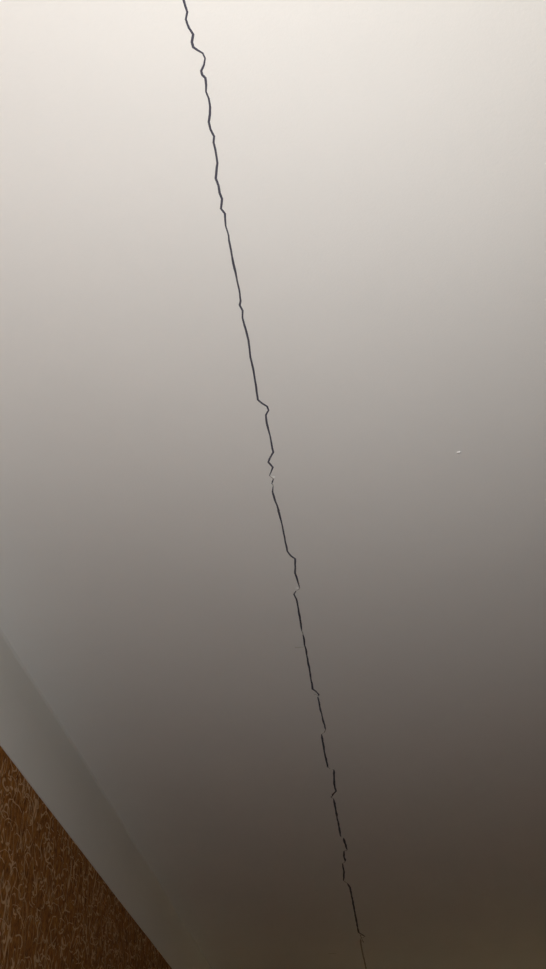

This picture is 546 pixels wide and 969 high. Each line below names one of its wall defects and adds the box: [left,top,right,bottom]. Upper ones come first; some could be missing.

crack [182,0,367,969]